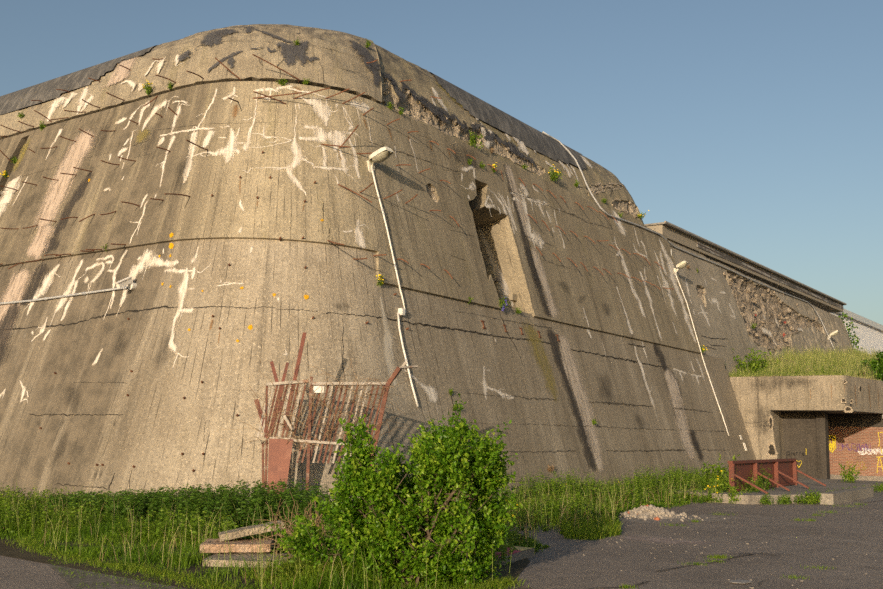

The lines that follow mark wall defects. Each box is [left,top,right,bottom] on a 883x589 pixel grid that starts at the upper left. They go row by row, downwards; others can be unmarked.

leakage [103,49,195,91]
spalling [381,73,545,176]
leakage [0,130,94,364]
leakage [31,85,373,367]
crack [11,305,663,370]
leakage [485,165,565,318]
leakage [548,330,604,472]
leakage [613,211,736,460]
spalling [723,272,823,354]